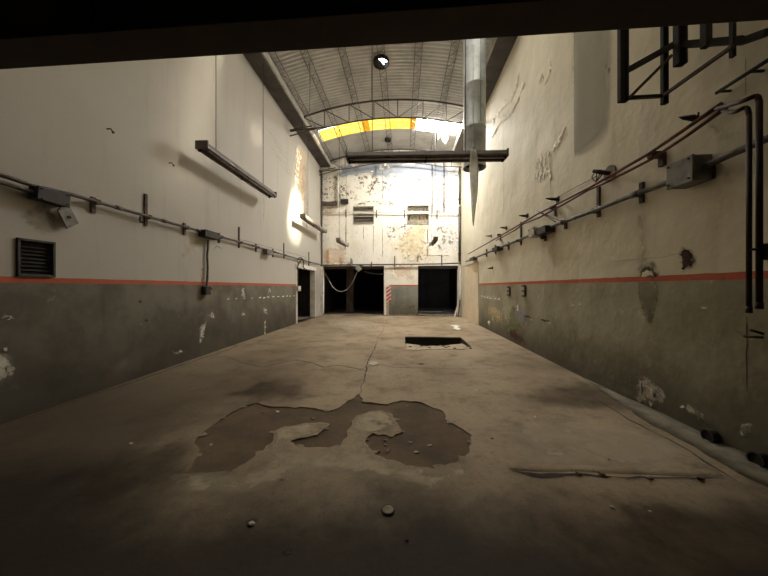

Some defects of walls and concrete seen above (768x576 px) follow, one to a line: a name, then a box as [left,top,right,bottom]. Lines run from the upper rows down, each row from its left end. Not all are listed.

peeling [323,163,396,206]
flaking render [0,348,15,377]
crack [228,291,412,391]
spalling [181,395,472,475]
crack [500,398,737,481]